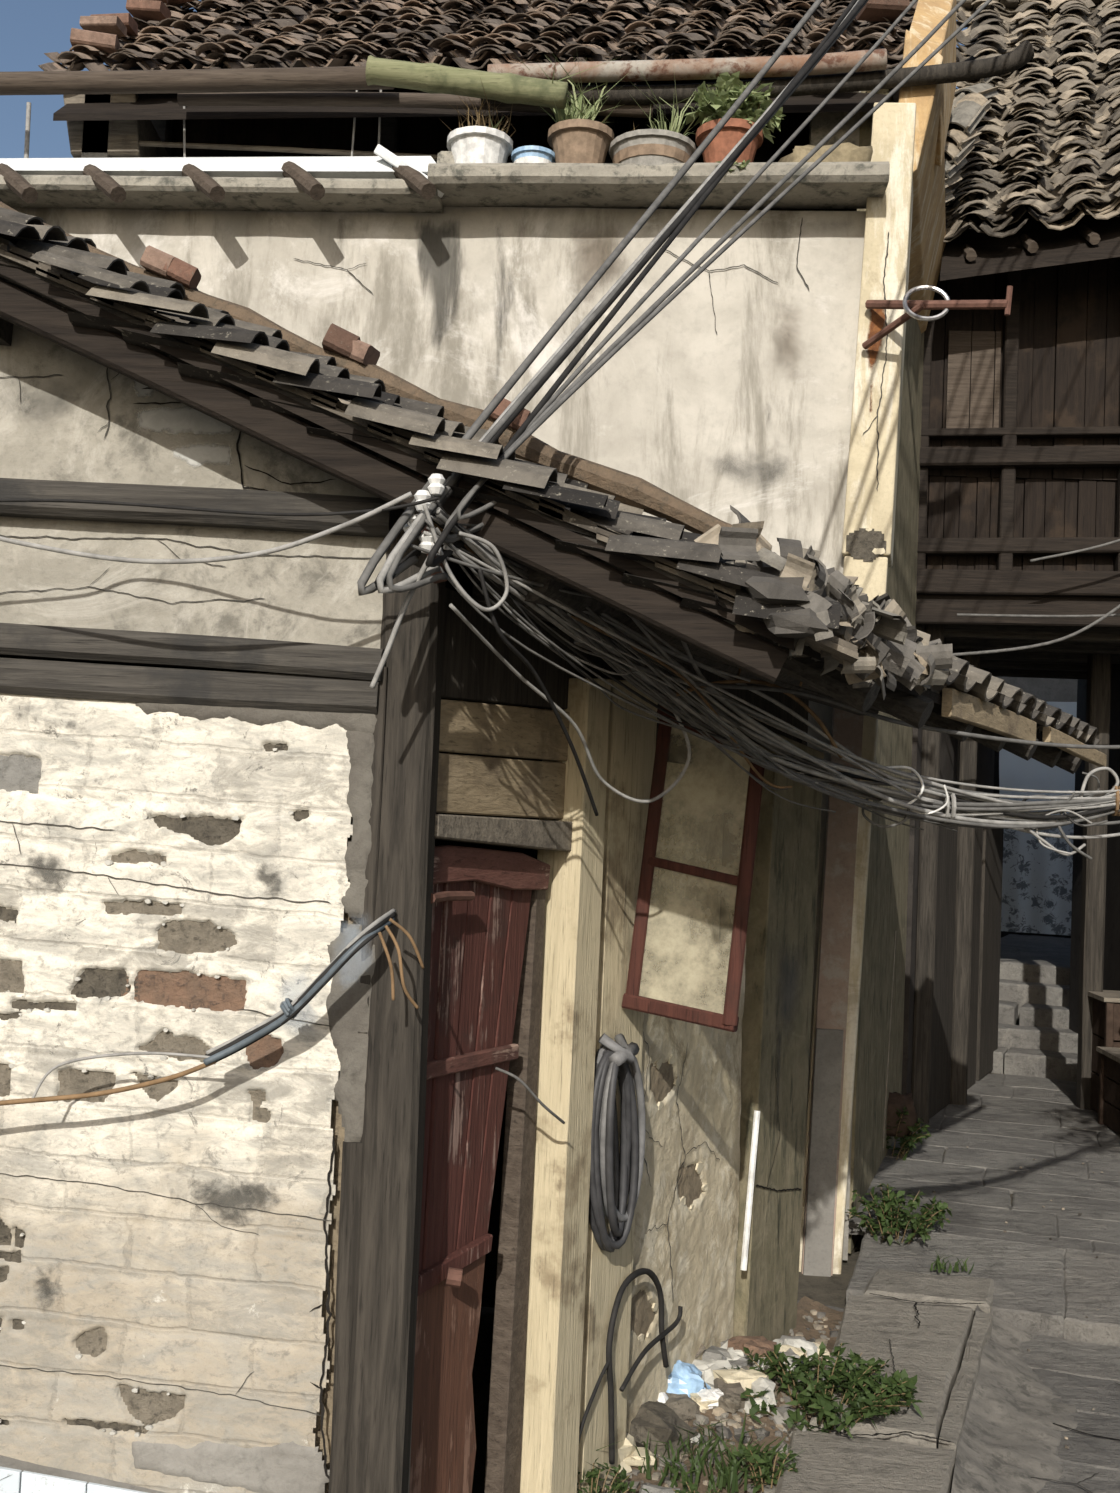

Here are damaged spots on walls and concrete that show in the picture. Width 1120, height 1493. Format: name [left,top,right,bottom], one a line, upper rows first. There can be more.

damp [418,225,459,341]
corrosion [867,309,885,367]
crack [0,374,60,404]
crack [97,368,180,438]
crack [236,431,334,491]
crack [0,535,370,604]
spalling [0,754,42,794]
spalling [105,849,167,867]
spalling [142,814,242,846]
spalling [0,899,247,1020]
spalling [53,1028,210,1104]
crack [1053,1423,1120,1440]